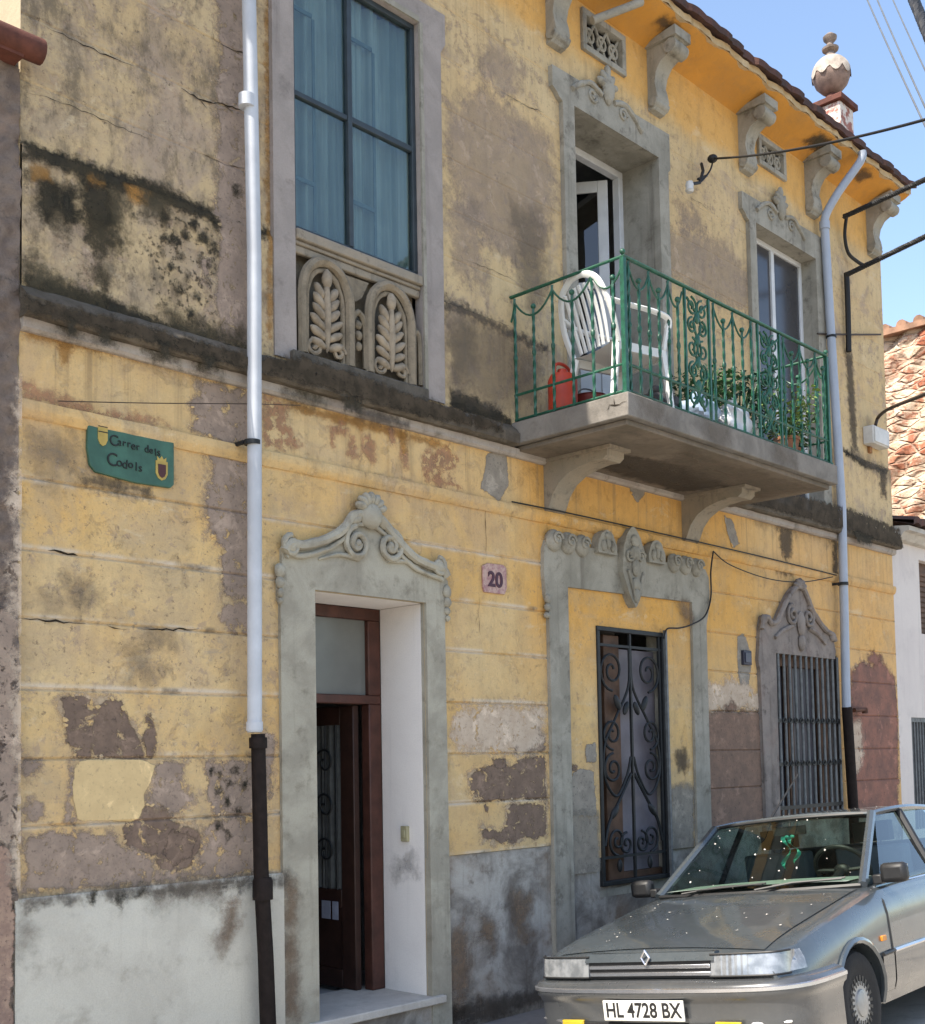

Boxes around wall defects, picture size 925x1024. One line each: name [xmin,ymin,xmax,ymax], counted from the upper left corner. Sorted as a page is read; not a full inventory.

crack [47,27,133,66]
crack [183,89,240,110]
damp [19,141,246,349]
damp [843,448,888,496]
crack [24,618,196,631]
peeling [0,607,254,1024]
peeling [264,732,278,798]
peeling [450,702,548,847]
spalling [708,634,763,828]
spalling [850,650,900,811]
damp [90,876,254,904]
damp [451,916,542,1024]